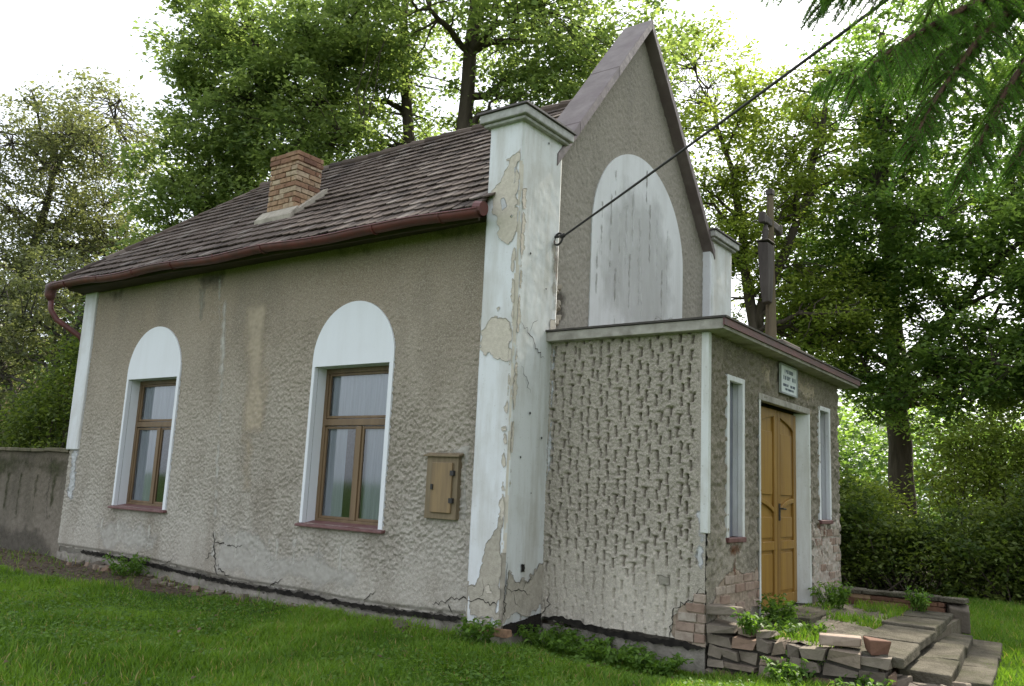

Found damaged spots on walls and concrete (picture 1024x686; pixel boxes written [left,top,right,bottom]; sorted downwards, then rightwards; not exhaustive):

peeling [479,150,531,468]
crack [80,531,703,651]
peeling [467,482,544,638]
spalling [669,591,707,647]